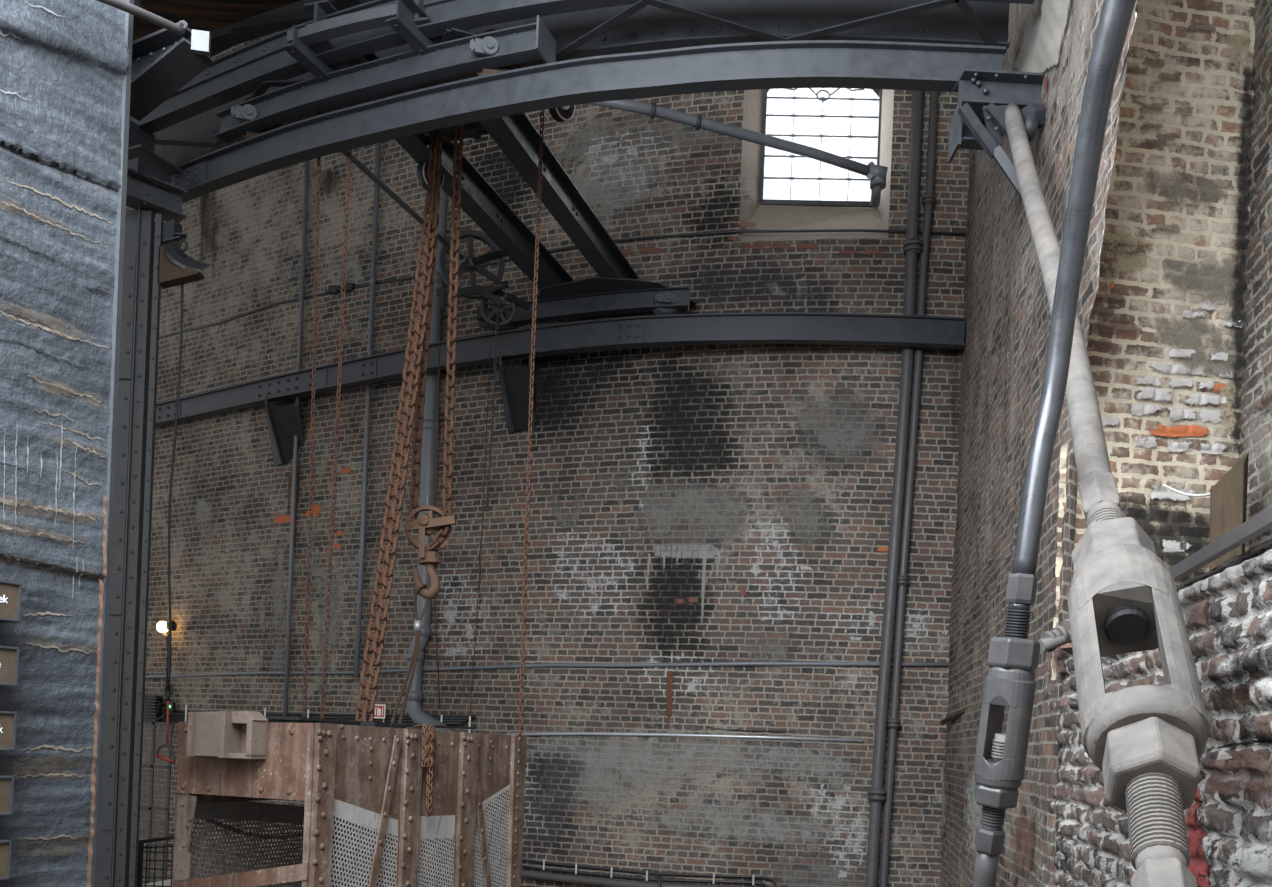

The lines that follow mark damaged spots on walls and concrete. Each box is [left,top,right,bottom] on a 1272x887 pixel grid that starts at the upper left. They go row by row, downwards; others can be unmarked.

crack [0,236,63,263]
crack [85,287,111,295]
crack [0,309,106,372]
damp [1101,349,1244,427]
spalling [1149,425,1210,438]
damp [1133,436,1227,454]
damp [631,425,651,507]
damp [1147,484,1196,501]
damp [1163,539,1190,553]
damp [549,530,725,619]
damp [1255,674,1272,701]
damp [1228,837,1272,887]